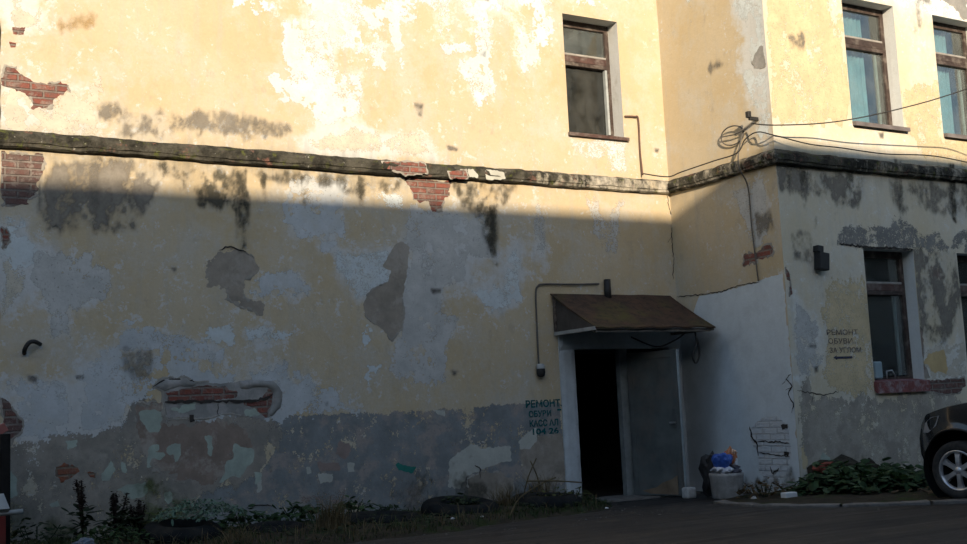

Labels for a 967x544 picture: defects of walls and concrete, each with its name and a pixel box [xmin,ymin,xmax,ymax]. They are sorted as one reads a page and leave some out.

peeling [900,0,967,21]
peeling [1,64,103,136]
damp [180,111,290,138]
flaking render [0,150,47,207]
damp [39,156,156,232]
damp [197,170,250,227]
damp [261,172,303,185]
damp [319,175,364,195]
peeling [266,0,505,387]
crack [667,196,758,297]
flaking render [749,273,966,487]
flaking render [0,319,361,544]